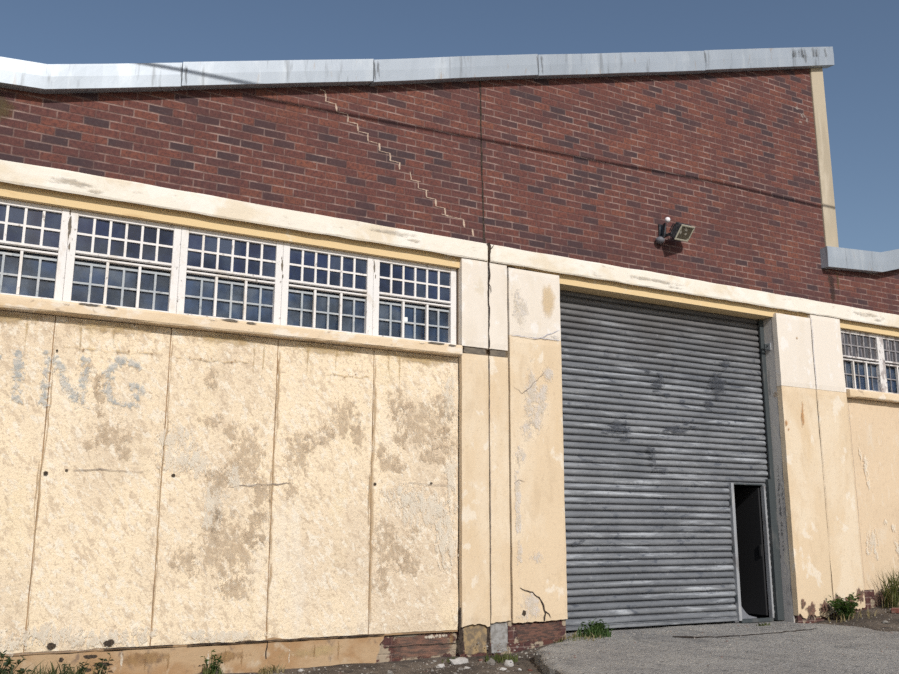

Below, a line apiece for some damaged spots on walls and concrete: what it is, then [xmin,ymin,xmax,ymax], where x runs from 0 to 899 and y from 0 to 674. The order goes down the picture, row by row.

crack [320,81,536,542]
water stain [544,290,553,312]
crack [512,330,558,340]
crack [521,588,551,621]